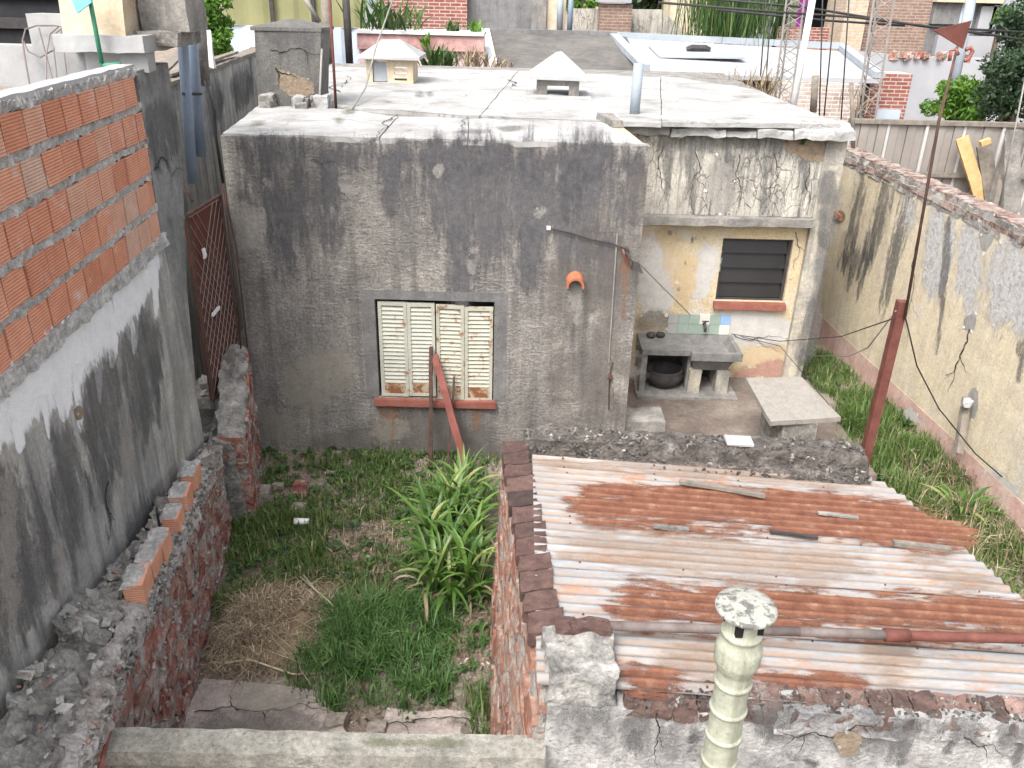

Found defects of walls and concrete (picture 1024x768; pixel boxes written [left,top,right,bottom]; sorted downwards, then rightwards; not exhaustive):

crack [270,48,319,87]
water stain [233,117,916,431]
peeling [637,231,680,330]
crack [654,146,708,208]
peeling [690,241,790,378]
crack [735,154,811,267]
water stain [935,215,952,356]
crack [946,329,970,389]
peeling [899,190,1024,343]
water stain [0,262,186,675]
spalling [8,443,231,768]
rust [528,451,1024,702]